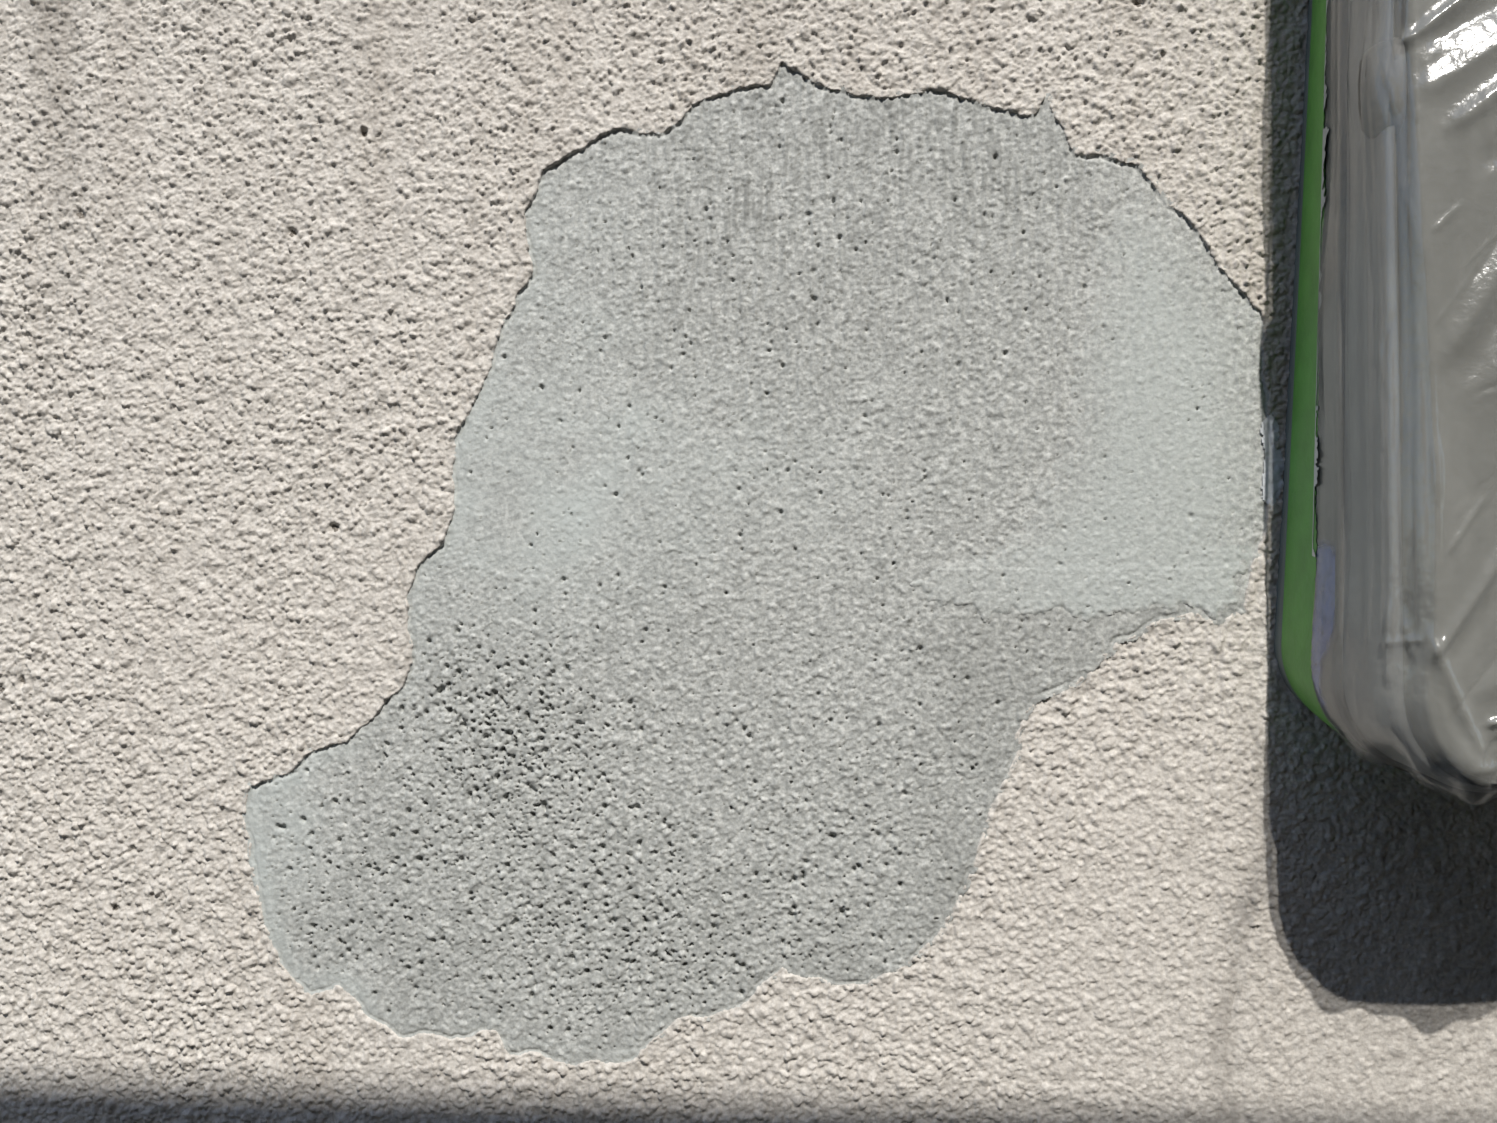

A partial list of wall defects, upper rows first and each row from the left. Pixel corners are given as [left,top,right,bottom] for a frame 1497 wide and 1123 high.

peeling [242,63,1284,1066]